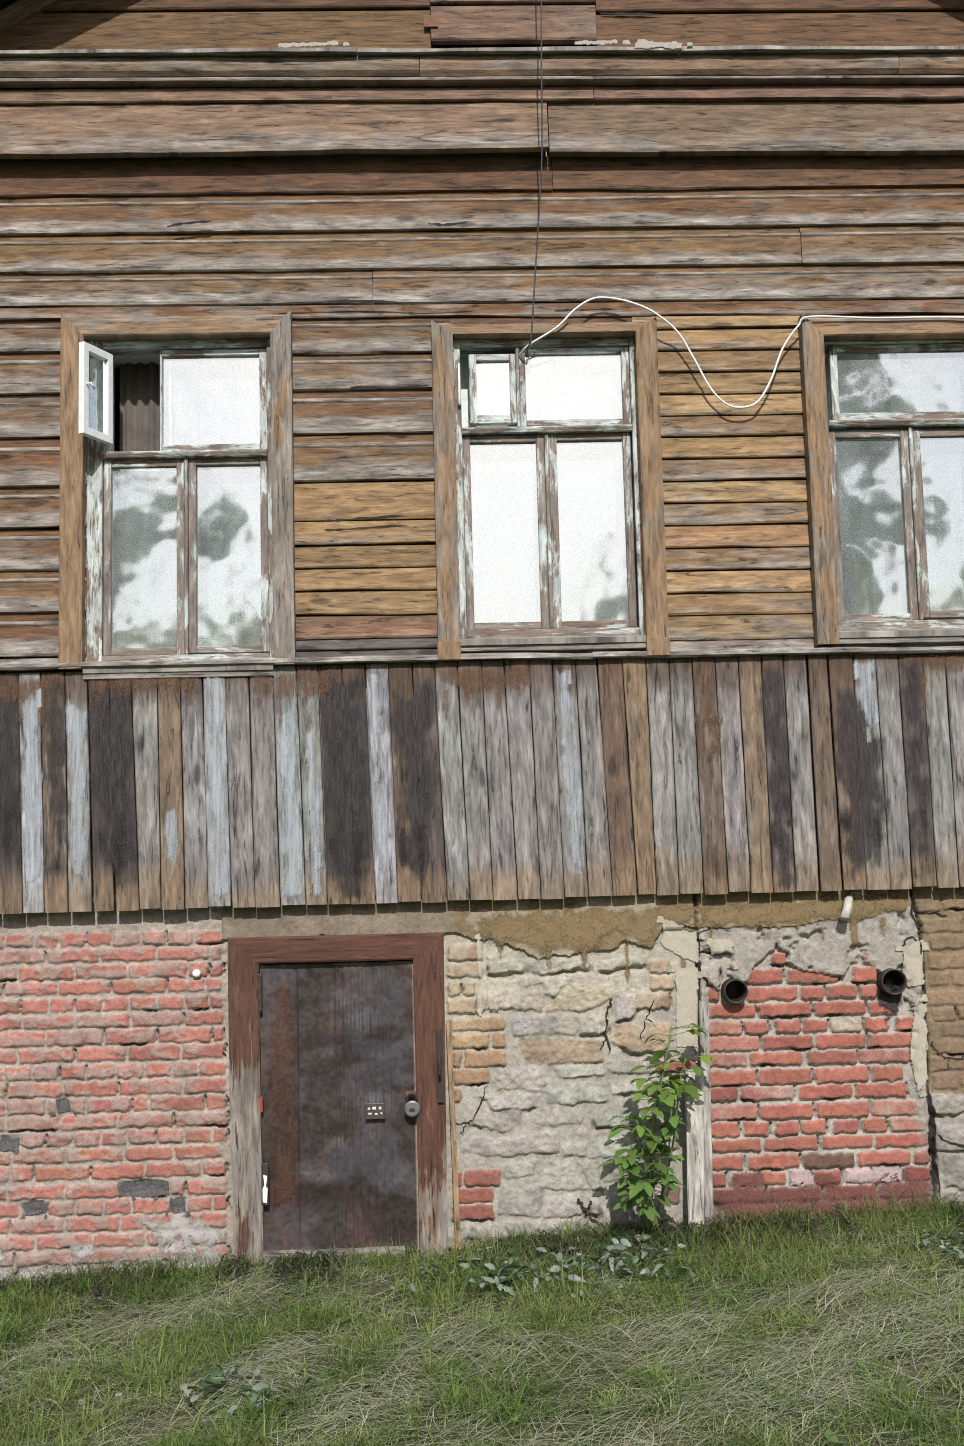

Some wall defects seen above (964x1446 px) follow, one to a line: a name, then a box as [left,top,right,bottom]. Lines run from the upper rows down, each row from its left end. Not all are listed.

crack [600,1000,654,1053]
peeling [895,939,930,1097]